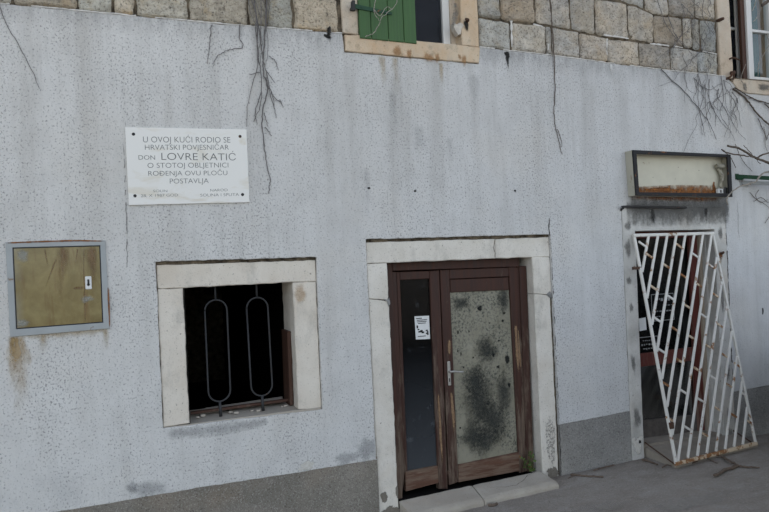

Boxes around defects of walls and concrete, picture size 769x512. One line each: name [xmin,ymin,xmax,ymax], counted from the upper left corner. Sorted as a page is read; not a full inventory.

rust [10,338,25,367]